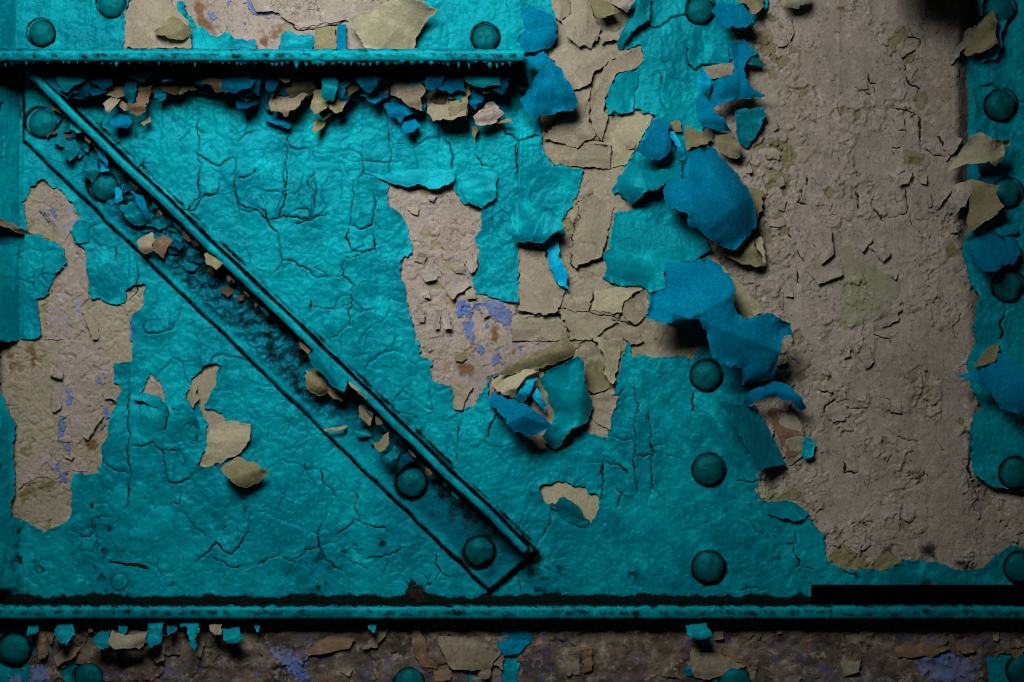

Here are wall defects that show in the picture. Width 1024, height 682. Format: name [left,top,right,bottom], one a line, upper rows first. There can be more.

peeling [124,0,438,49]
peeling [38,67,264,128]
crack [445,62,619,179]
peeling [0,179,269,533]
peeling [44,102,269,316]
crack [183,119,403,349]
crack [570,193,593,269]
crack [521,288,646,343]
peeling [263,0,1024,572]
crack [74,392,402,583]
crack [589,381,689,506]
peeling [7,619,1024,682]